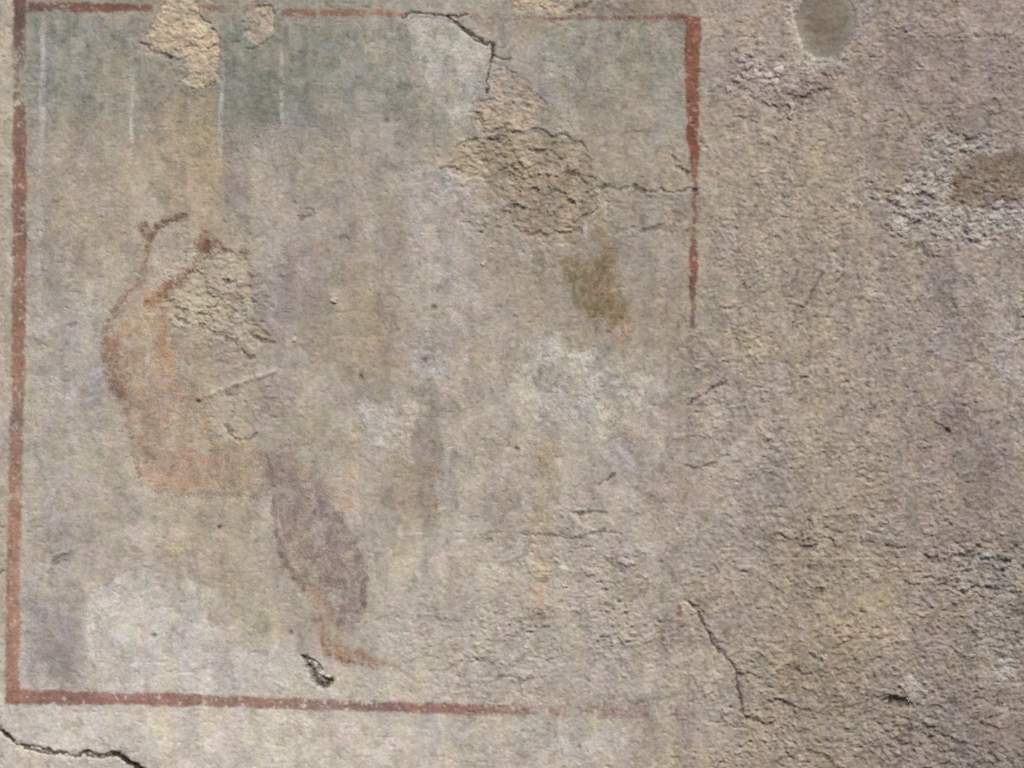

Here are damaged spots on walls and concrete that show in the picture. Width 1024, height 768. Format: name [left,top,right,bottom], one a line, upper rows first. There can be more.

flaking render [150,0,220,90]
flaking render [250,6,275,43]
crack [406,12,495,93]
water stain [562,252,626,323]
crack [684,599,773,725]
crack [0,727,143,768]